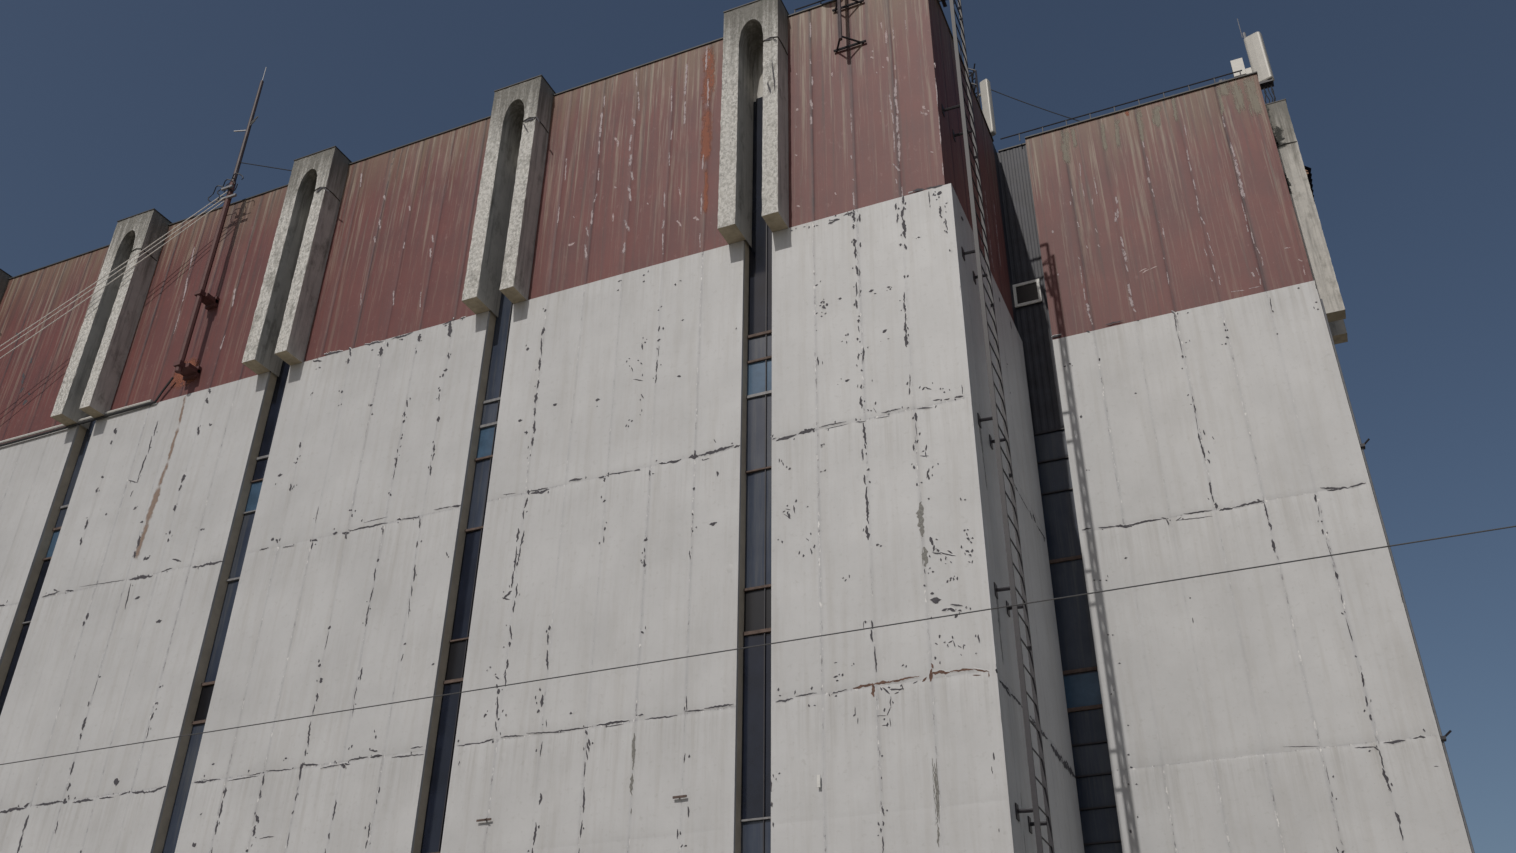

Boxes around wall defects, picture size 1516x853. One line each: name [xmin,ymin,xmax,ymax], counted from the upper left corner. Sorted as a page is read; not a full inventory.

corrosion [701,49,715,212]
crack [1082,313,1277,553]
crack [0,192,963,853]
peeling [916,501,981,664]
peeling [879,664,917,726]
crack [853,620,1075,777]